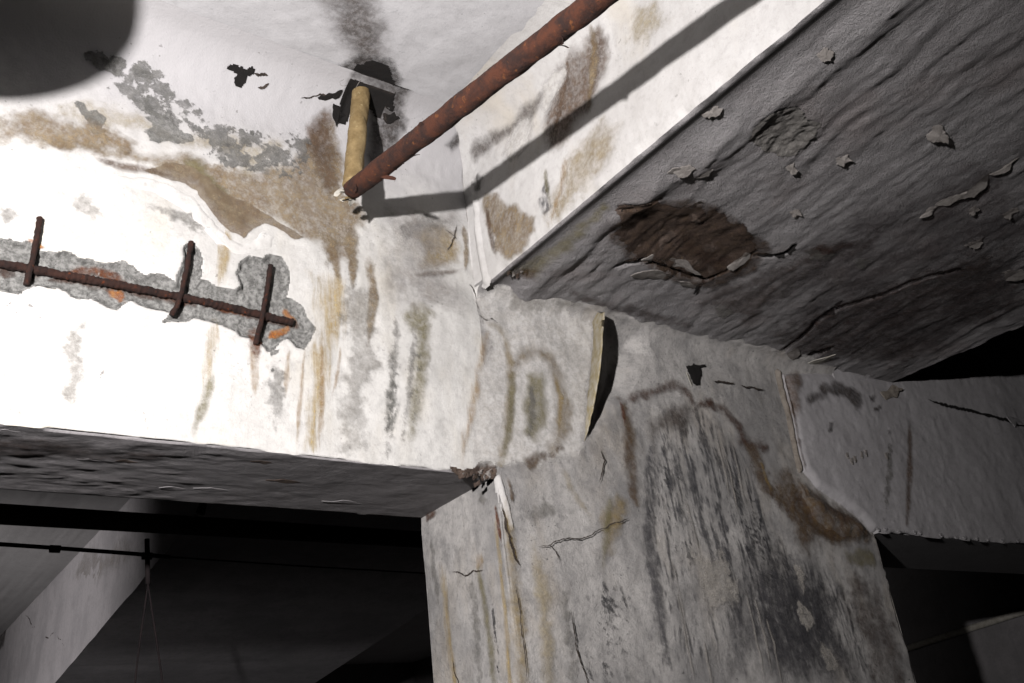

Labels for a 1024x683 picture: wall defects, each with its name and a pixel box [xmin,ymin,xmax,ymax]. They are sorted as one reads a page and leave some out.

peeling [84,50,311,178]
damp [540,29,606,144]
corrosion [51,267,196,306]
spalling [0,175,316,352]
damp [0,111,378,337]
corrosion [250,310,298,355]
spalling [686,363,706,386]
crack [929,399,1024,427]
spalling [450,461,497,488]
crack [502,510,629,564]
damp [605,382,894,682]
crack [516,590,527,676]